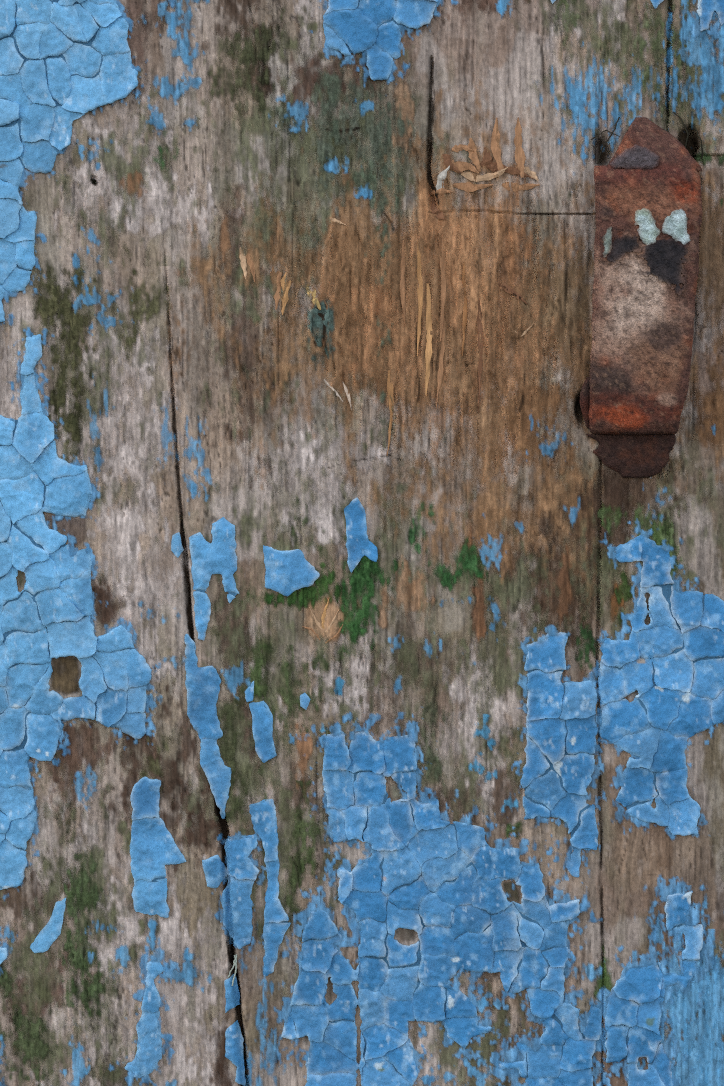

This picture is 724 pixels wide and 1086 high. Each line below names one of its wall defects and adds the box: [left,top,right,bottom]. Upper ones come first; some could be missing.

peeling [294,0,439,81]
peeling [0,0,244,335]
crack [428,61,439,204]
crack [168,349,176,436]
peeling [0,325,239,890]
crack [180,518,194,641]
peeling [250,424,392,596]
peeling [30,898,66,953]
peeling [62,681,291,1086]
crack [207,779,229,890]
peeling [281,534,724,1086]
crack [226,939,247,1086]